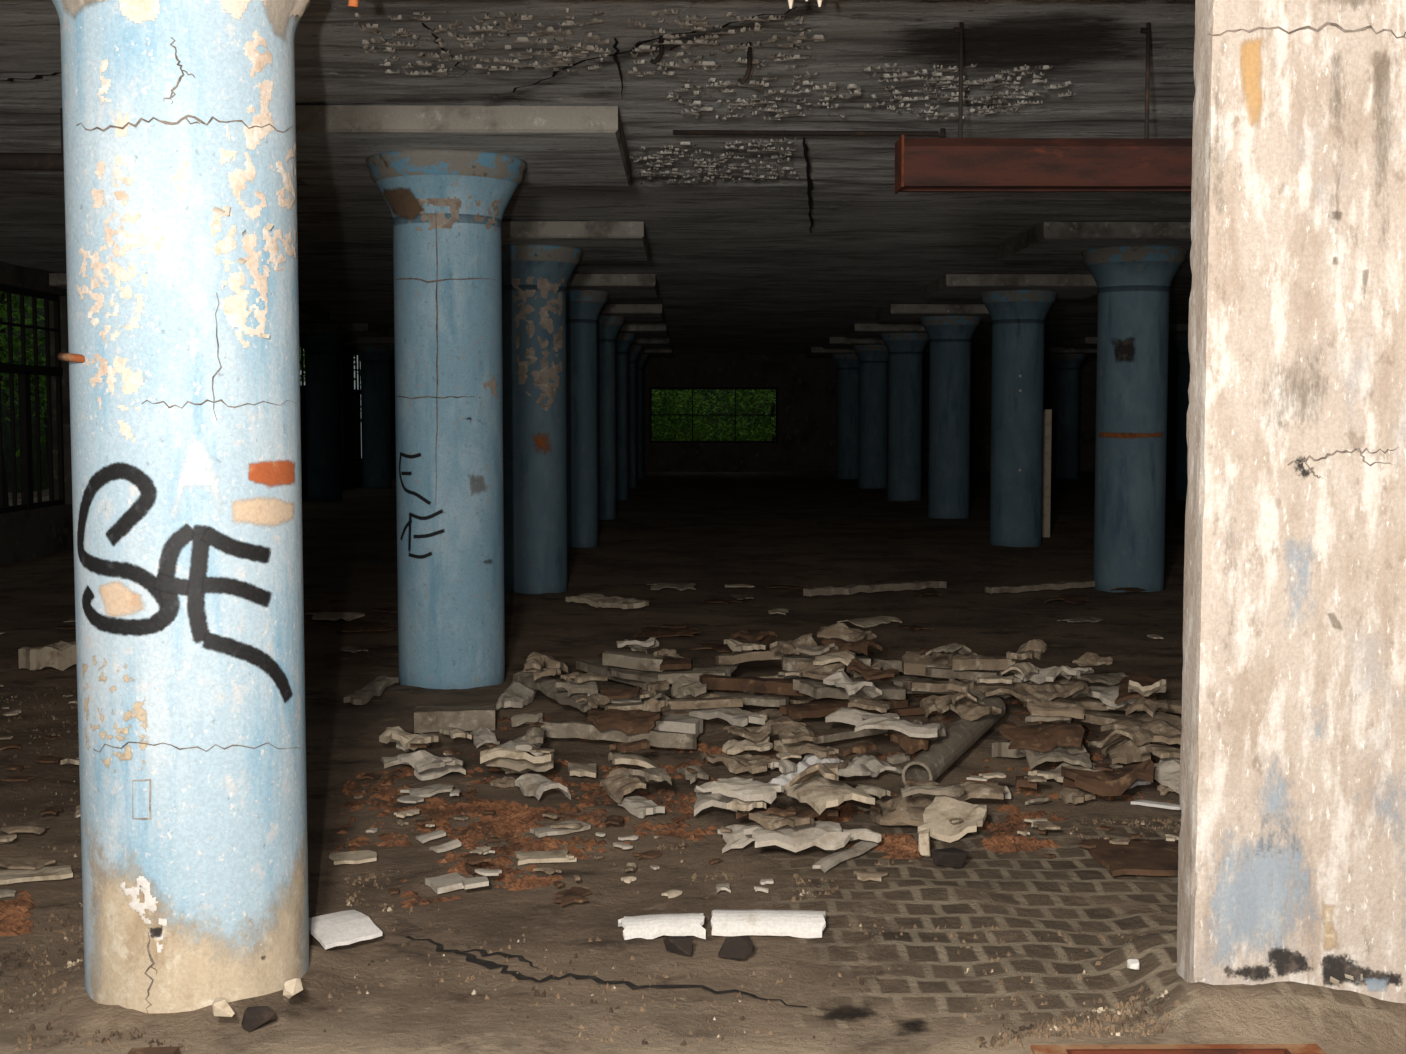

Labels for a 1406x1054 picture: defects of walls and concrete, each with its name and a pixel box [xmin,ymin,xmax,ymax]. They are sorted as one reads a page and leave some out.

peeling [62,0,160,24]
crack [76,37,296,132]
crack [499,7,797,99]
damp [354,8,1140,120]
crack [1206,22,1406,39]
peeling [211,0,309,348]
damp [629,137,799,185]
peeling [77,155,165,442]
peeling [511,277,565,411]
crack [144,932,157,1014]
peeling [90,841,307,1013]
crack [406,936,807,1007]